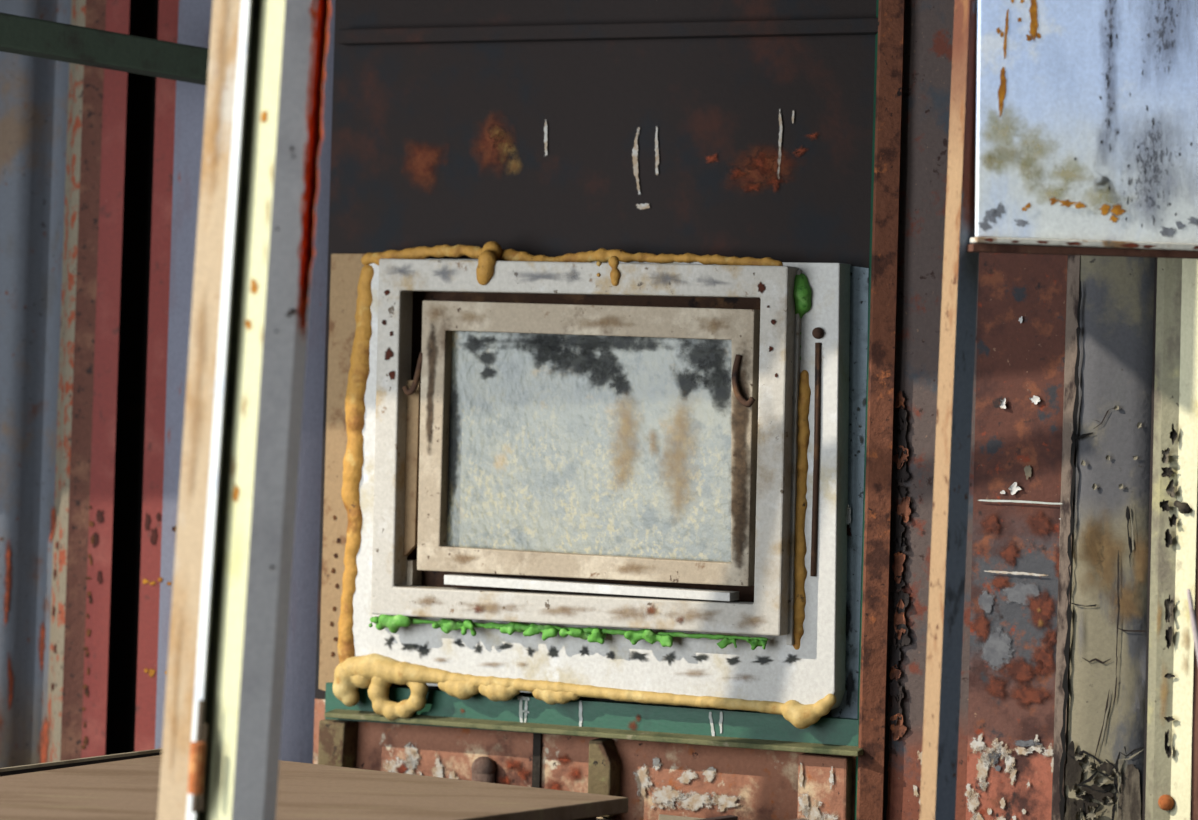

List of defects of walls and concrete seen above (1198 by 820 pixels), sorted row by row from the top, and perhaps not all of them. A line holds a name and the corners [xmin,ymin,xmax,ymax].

corrosion [996,0,1041,117]
water stain [1100,0,1118,133]
water stain [1147,0,1178,71]
corrosion [298,0,331,334]
water stain [1109,105,1192,226]
peeling [1159,423,1177,548]
corrosion [39,605,57,671]
corrosion [987,590,1057,707]
peeling [1164,594,1174,649]
peeling [634,758,741,812]
spalling [965,734,1141,820]
peeling [1164,716,1175,758]